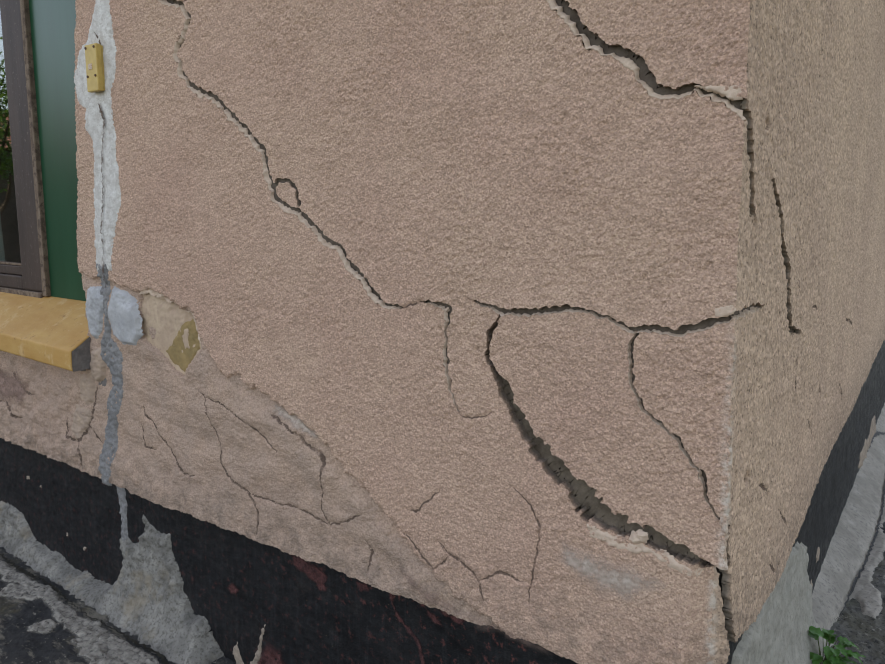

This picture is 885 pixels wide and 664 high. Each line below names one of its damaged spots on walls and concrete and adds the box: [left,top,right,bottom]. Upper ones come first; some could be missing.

crack [546,0,754,220]
crack [158,0,490,419]
spalling [139,288,202,375]
crack [66,388,102,465]
crack [142,407,195,477]
crack [202,393,360,535]
crack [403,486,541,598]
crack [500,375,726,630]
crack [477,301,762,519]
spalling [587,524,703,577]
peeling [858,415,876,468]
peeling [233,624,284,664]